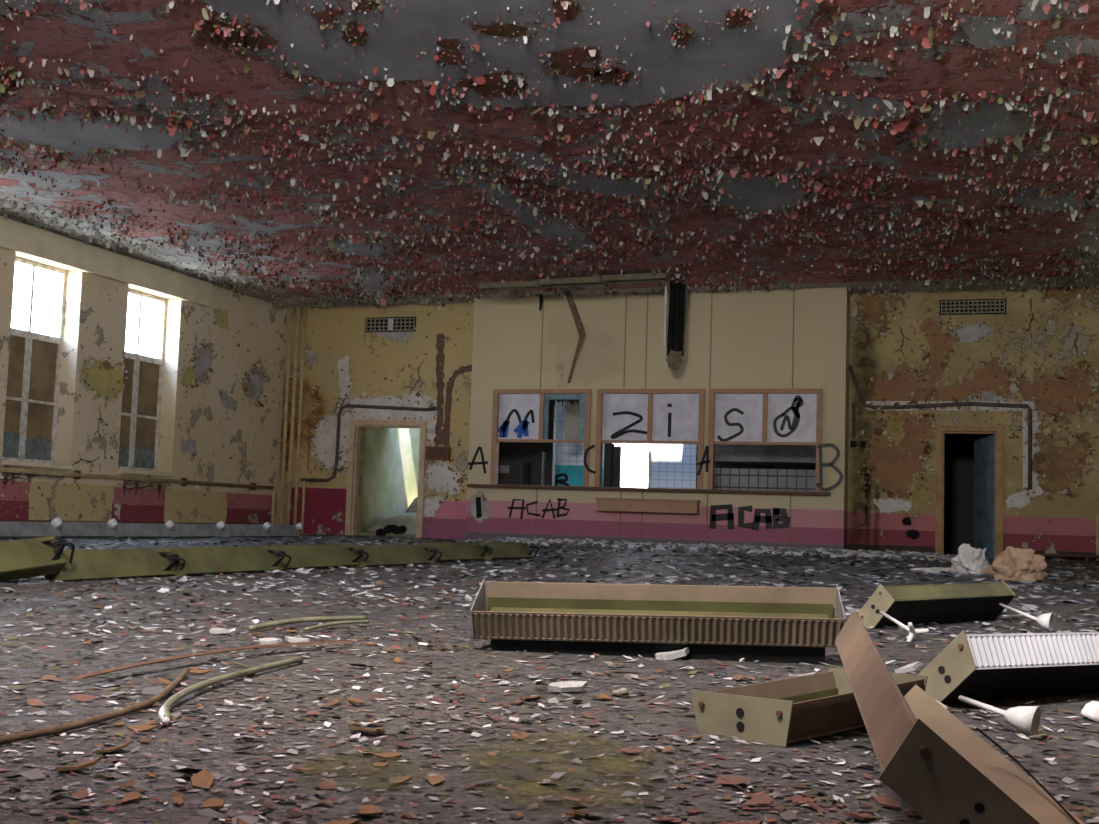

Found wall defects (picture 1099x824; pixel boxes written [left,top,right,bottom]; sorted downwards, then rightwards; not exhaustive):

peeling [0,0,1099,539]